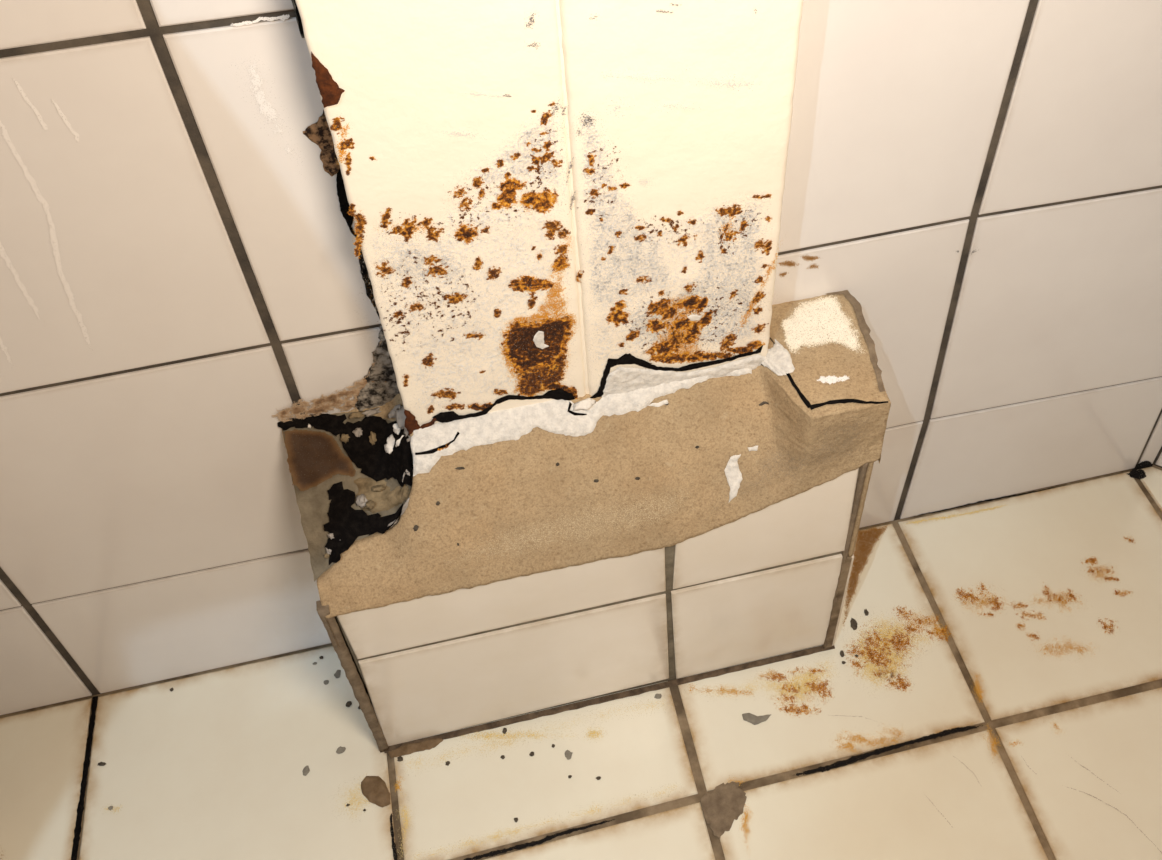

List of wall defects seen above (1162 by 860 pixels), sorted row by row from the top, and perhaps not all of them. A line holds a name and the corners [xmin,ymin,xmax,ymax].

corrosion [311,51,355,176]
corrosion [348,101,782,455]
spalling [271,100,772,582]
crack [761,338,888,410]
corrosion [1081,556,1133,597]
corrosion [684,525,952,718]
corrosion [952,583,1095,657]
corrosion [836,725,909,752]
corrosion [740,806,754,857]